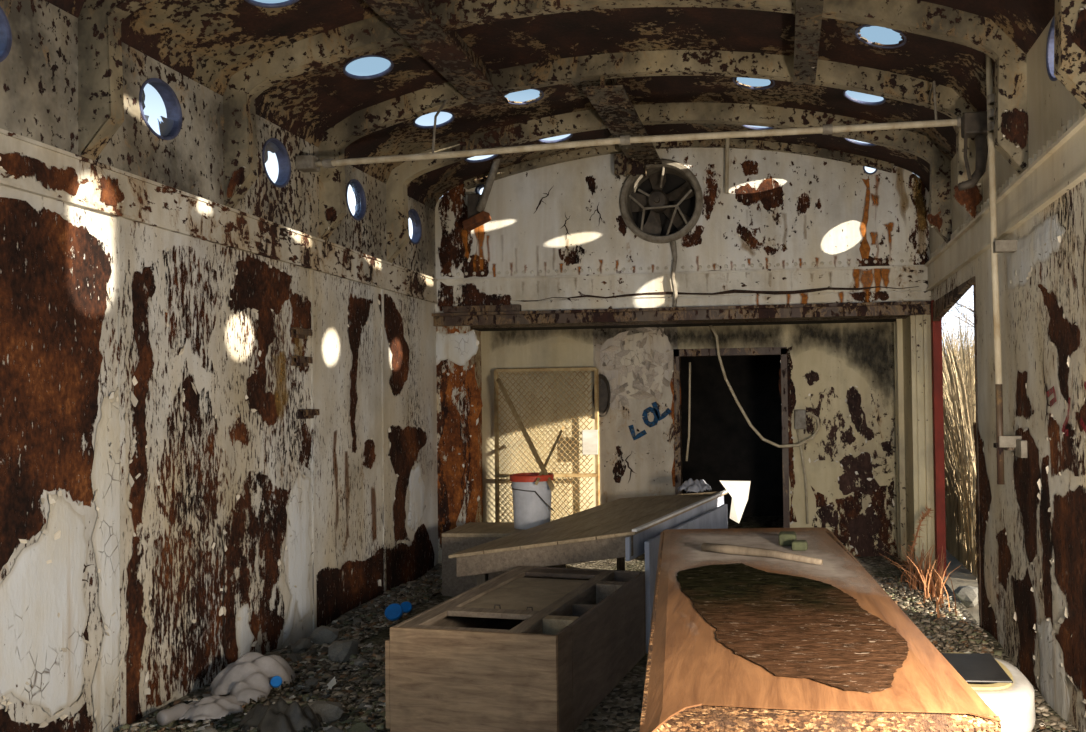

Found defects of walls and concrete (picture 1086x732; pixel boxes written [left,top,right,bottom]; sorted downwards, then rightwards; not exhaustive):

rust [0,152,79,195]
rust [437,184,512,311]
rust [839,176,894,303]
rust [897,168,943,265]
rust [0,197,112,571]
peeling [0,387,128,732]
rust [316,293,483,627]
peeling [593,327,678,507]
rust [779,347,897,557]
rust [973,284,1086,717]